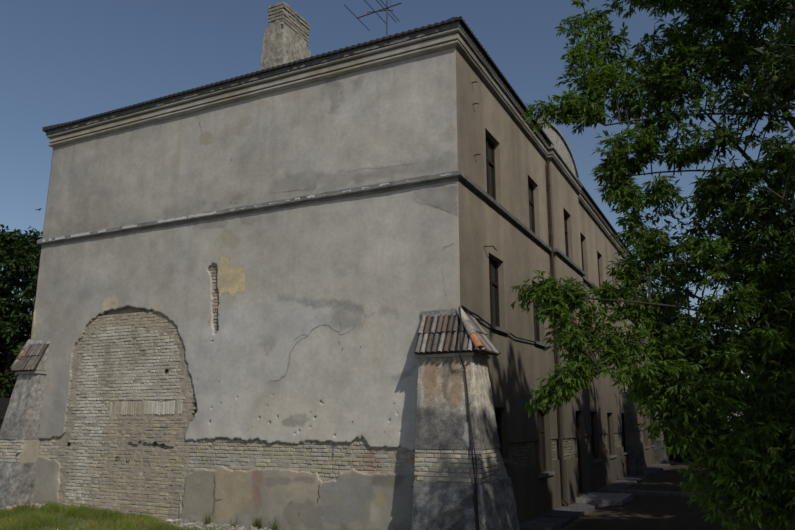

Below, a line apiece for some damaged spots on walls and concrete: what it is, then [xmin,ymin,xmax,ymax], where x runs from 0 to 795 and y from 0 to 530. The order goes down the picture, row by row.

peeling [209,255,246,334]
flaking render [38,295,501,530]